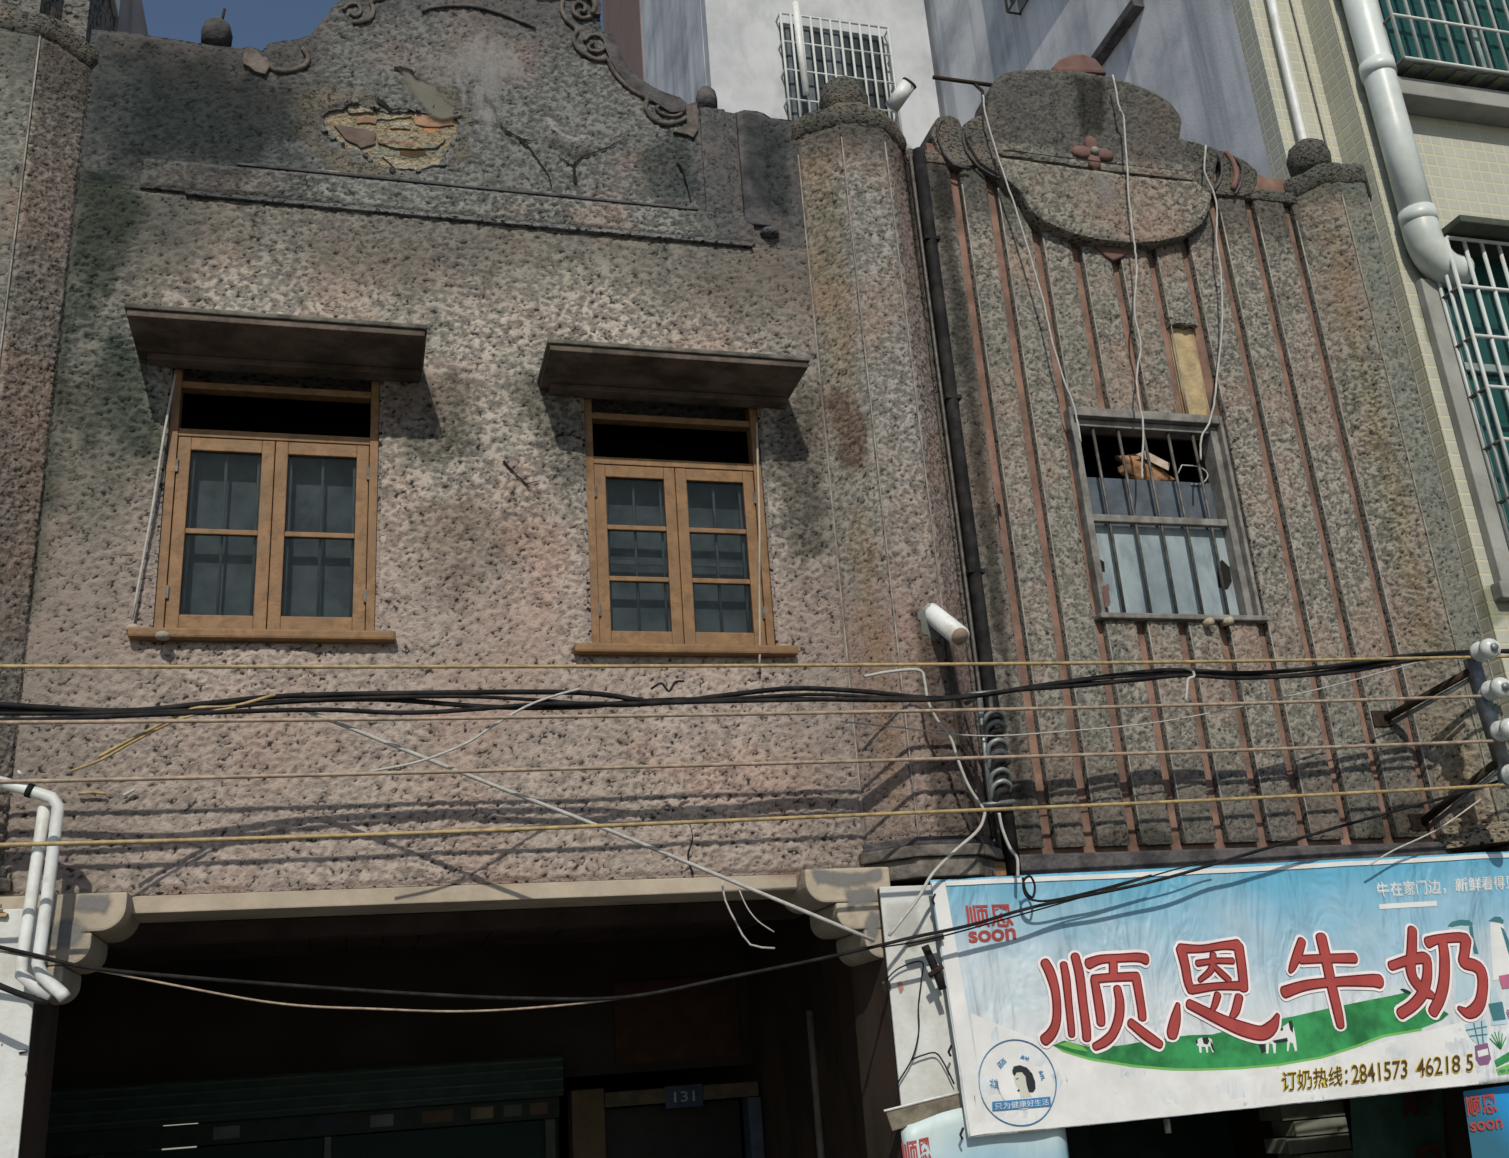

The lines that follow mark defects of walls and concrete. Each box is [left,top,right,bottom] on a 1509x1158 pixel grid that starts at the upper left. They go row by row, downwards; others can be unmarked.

flaking render [295,73,467,175]
crack [469,93,623,186]
crack [676,163,691,201]